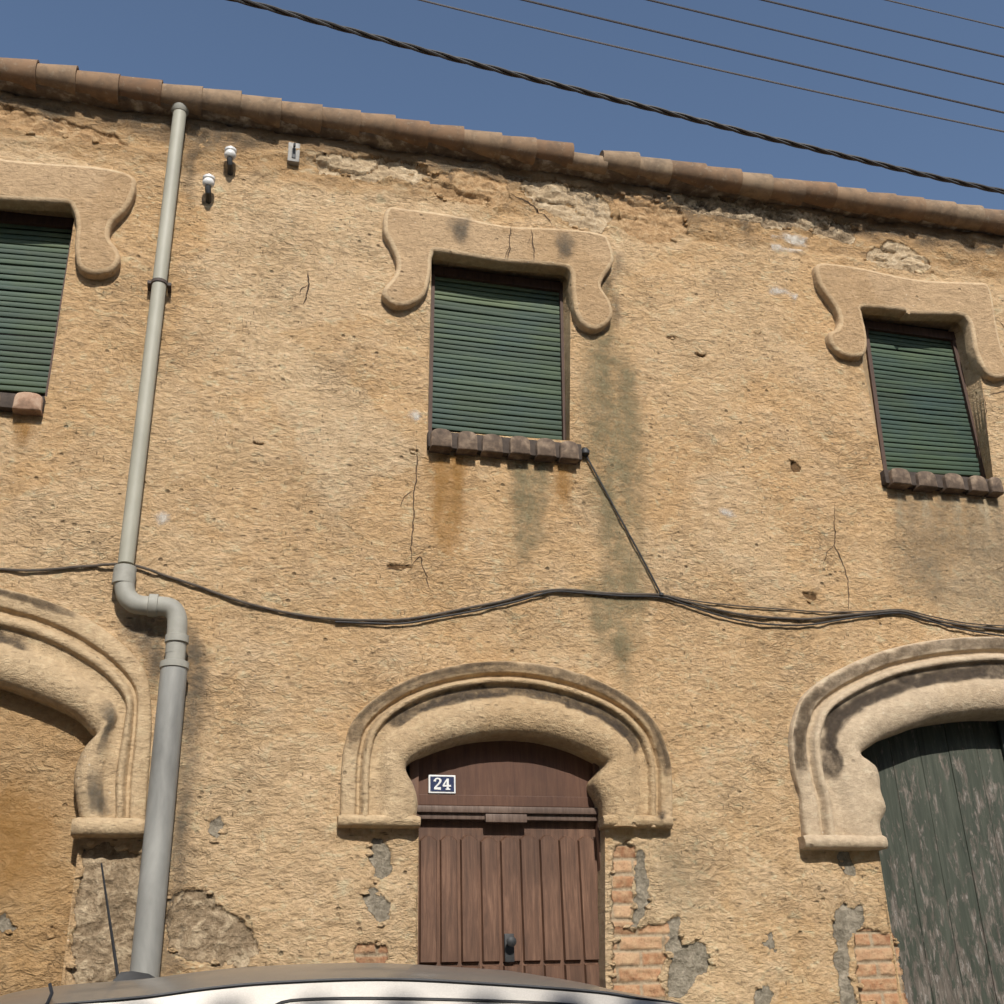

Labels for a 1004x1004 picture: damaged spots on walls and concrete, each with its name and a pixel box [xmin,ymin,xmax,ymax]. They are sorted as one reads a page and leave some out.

flaking render [316,154,509,209]
flaking render [520,180,855,244]
crack [386,445,429,587]
damp [588,339,640,657]
crack [823,510,850,609]
flaking render [65,841,141,984]
flaking render [165,890,260,968]
flaking render [354,940,388,963]
flaking render [360,838,393,927]
flaking render [831,902,909,1004]